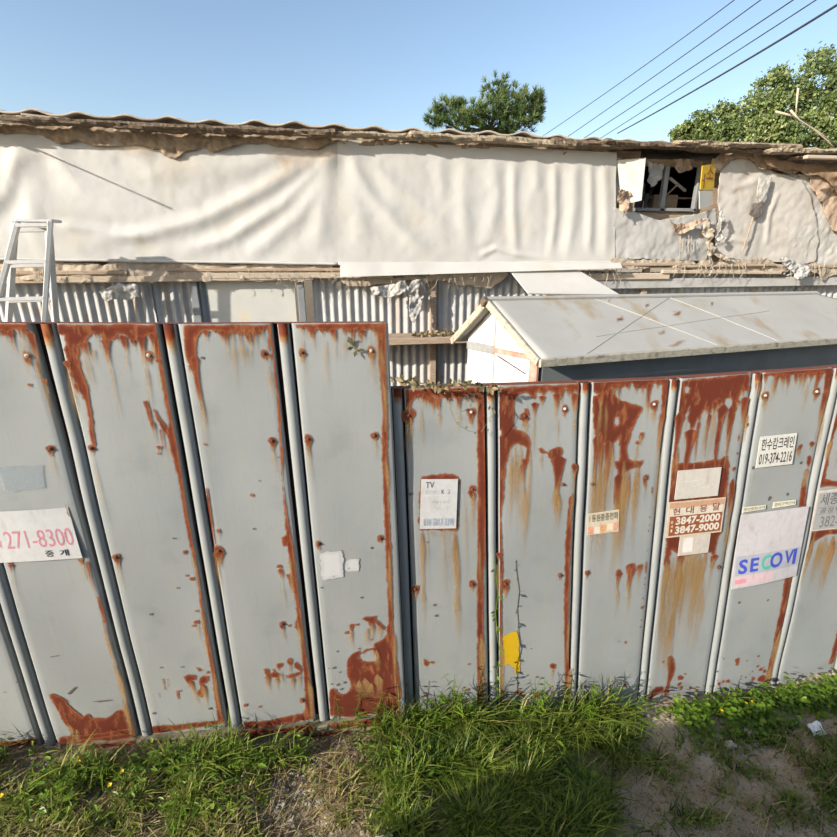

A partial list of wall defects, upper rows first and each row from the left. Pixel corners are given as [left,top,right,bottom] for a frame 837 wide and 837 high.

rust [0,323,837,748]